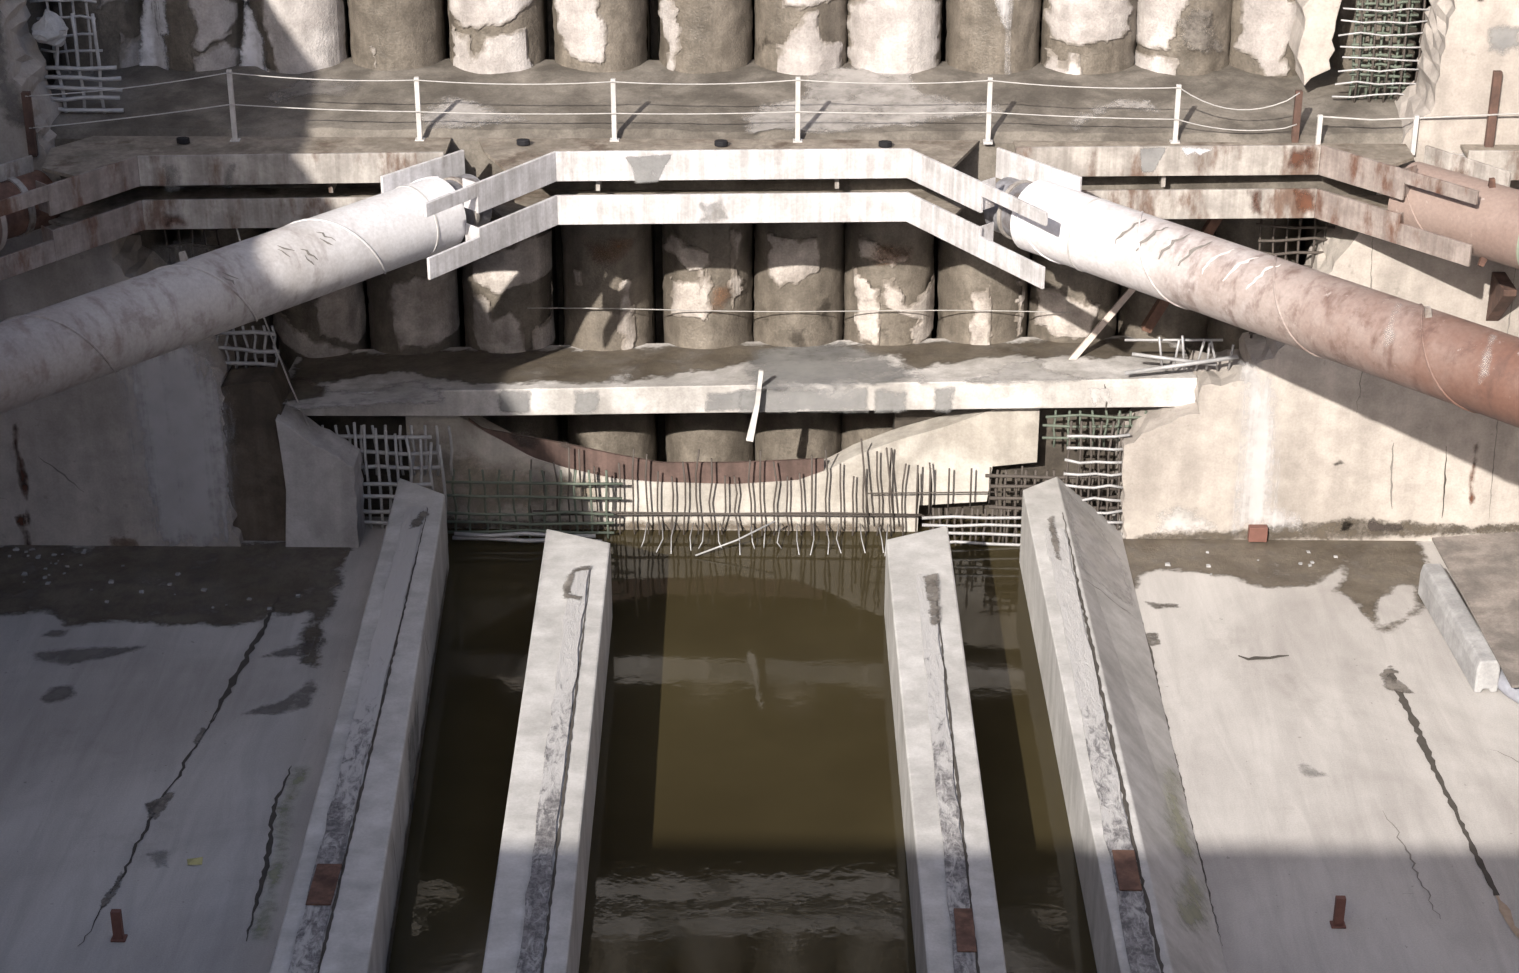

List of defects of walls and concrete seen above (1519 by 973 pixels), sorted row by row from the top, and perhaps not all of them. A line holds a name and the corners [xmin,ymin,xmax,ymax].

peeling [448,0,534,74]
peeling [553,0,609,65]
peeling [658,0,682,71]
peeling [776,0,941,75]
spalling [1332,0,1430,103]
peeling [853,234,935,346]
spalling [321,410,1147,560]
damp [42,686,72,702]
damp [37,630,139,664]
crack [78,597,279,946]
crack [246,766,292,941]
crack [1380,669,1519,938]